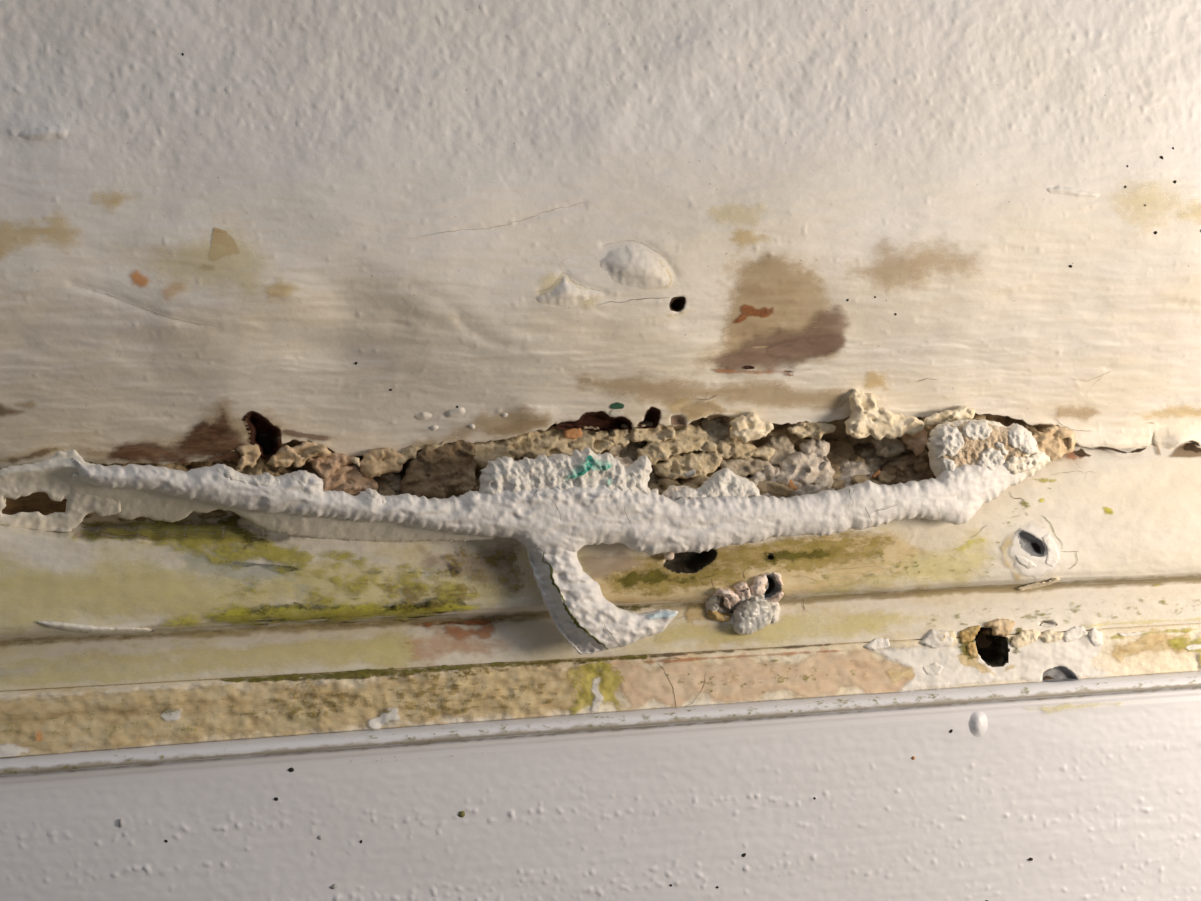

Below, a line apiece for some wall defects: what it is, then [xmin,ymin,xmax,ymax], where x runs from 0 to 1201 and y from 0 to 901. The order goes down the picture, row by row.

damp [581,258,847,419]
spalling [0,389,1201,533]
spalling [937,619,1063,657]